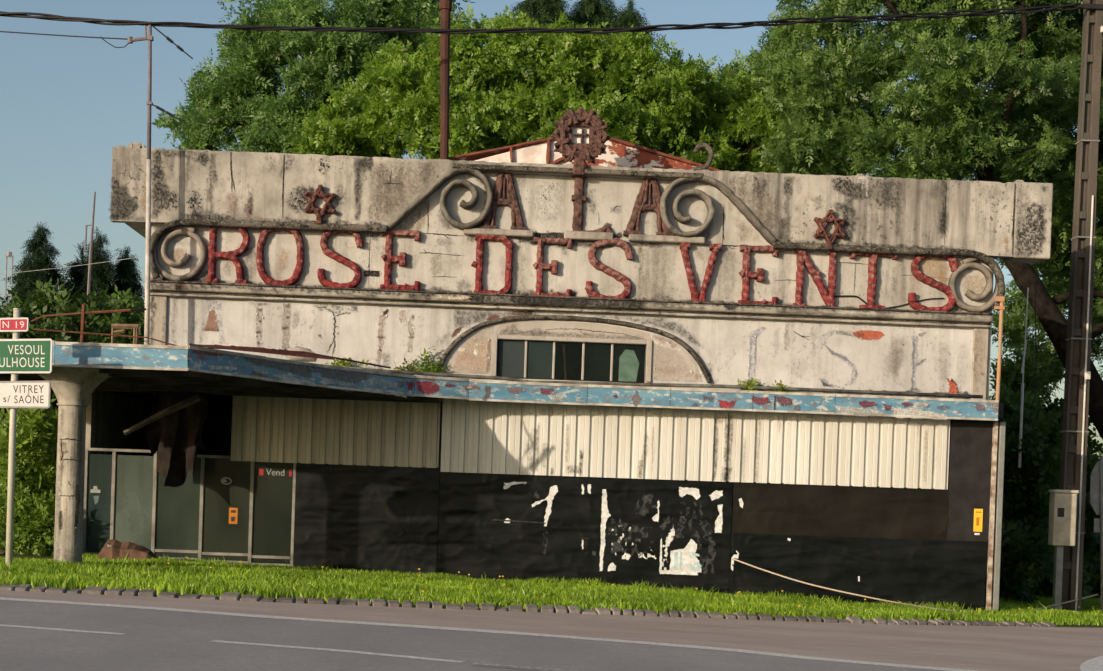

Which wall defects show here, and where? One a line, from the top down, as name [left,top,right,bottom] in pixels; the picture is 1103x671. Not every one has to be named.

water stain [111,181,138,220]
water stain [150,151,695,345]
water stain [779,177,901,245]
mould [1017,203,1045,255]
crack [317,307,346,356]
peeling [822,330,884,384]
peeling [692,396,735,408]
peeling [835,401,947,420]
peeling [947,379,959,394]